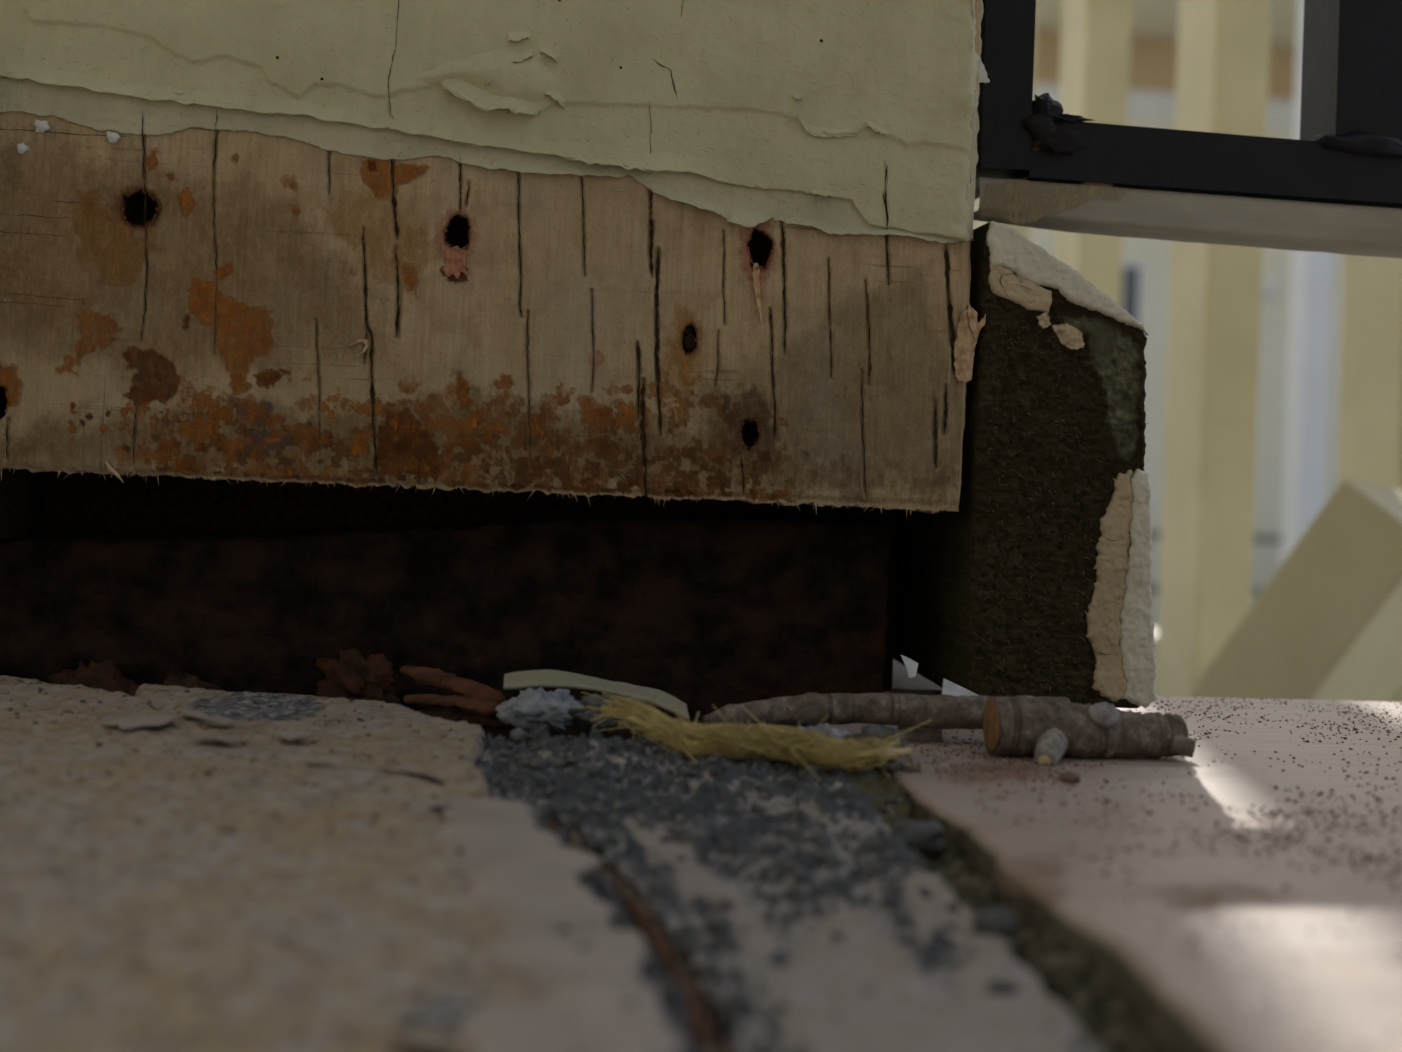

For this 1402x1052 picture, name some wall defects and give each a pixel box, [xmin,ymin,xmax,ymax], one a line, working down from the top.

corrosion [0,365,20,407]
crack [362,160,400,476]
corrosion [360,159,429,198]
corrosion [57,265,793,502]
corrosion [437,212,467,283]
peeling [0,63,968,243]
crack [636,191,662,496]
crack [828,165,889,496]
crack [933,246,956,468]
peeling [986,221,1157,708]
peeling [900,654,918,678]
peeling [941,678,980,696]